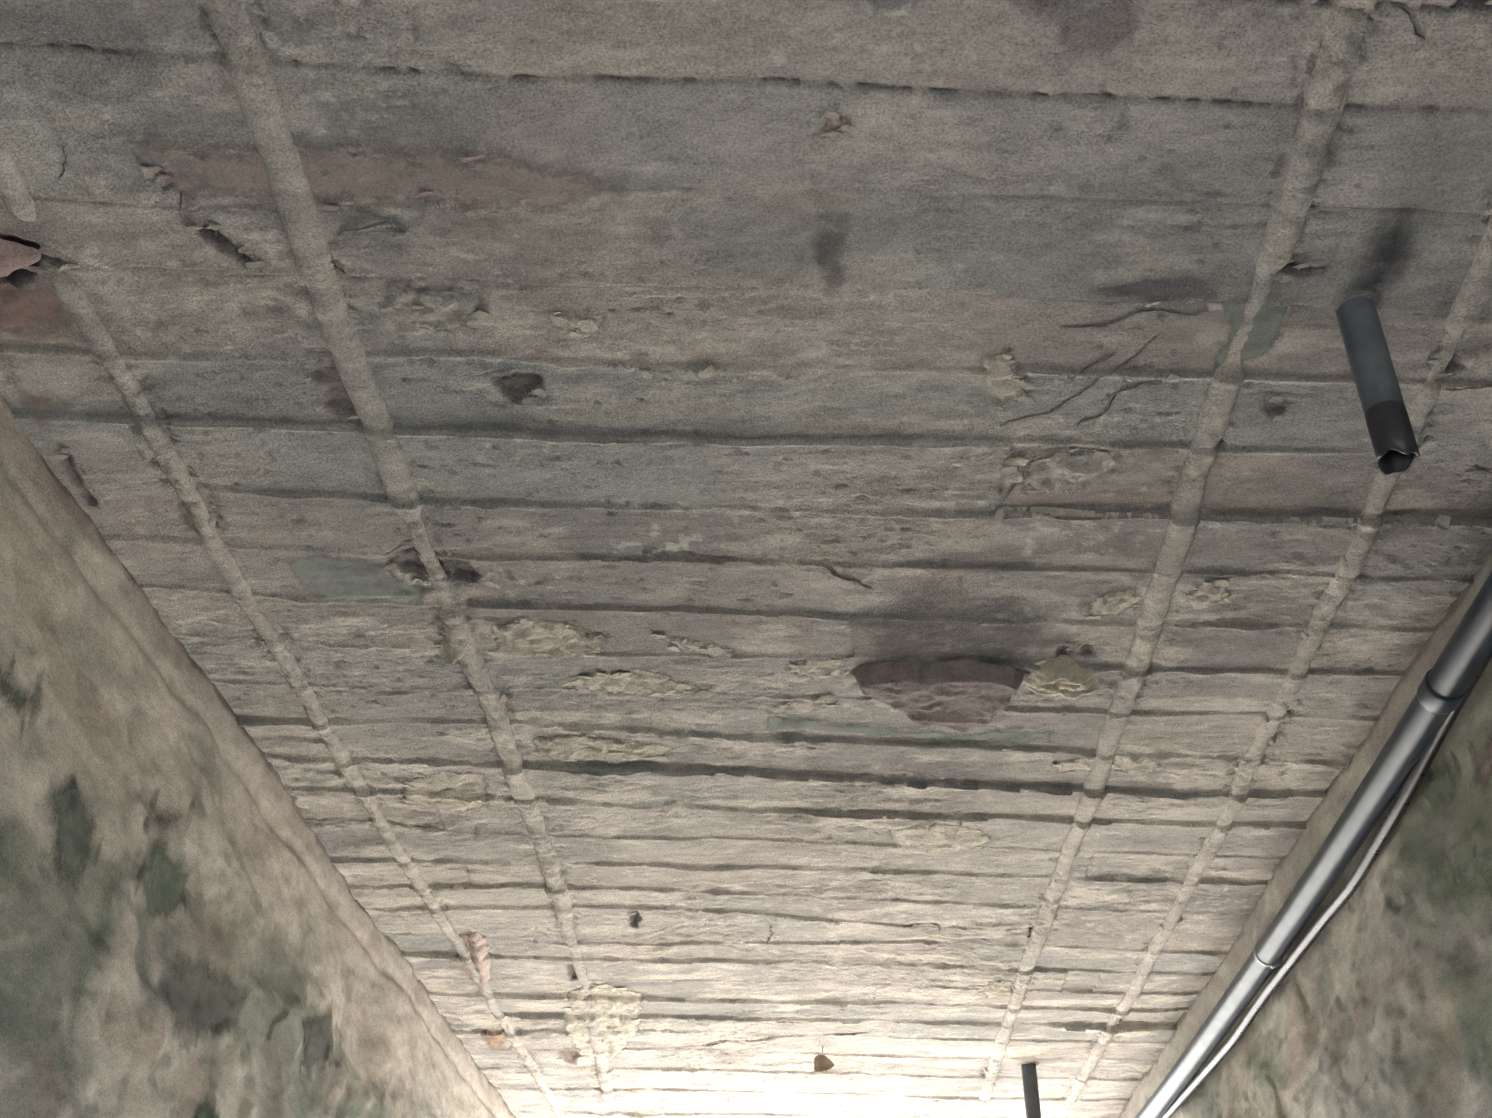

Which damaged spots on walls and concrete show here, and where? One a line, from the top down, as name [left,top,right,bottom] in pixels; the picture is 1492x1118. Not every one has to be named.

spalling [0,229,81,291]
crack [1000,300,1227,500]